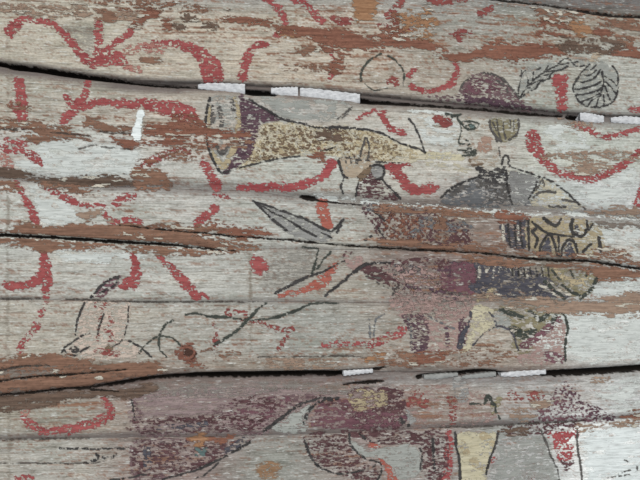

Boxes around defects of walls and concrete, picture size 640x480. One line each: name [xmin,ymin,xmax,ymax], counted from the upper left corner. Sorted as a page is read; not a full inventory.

peeling [0,0,640,75]
crack [0,62,198,89]
crack [245,88,276,96]
crack [360,99,577,121]
peeling [0,205,272,257]
crack [0,224,640,270]
peeling [0,353,167,413]
crack [0,355,386,396]
crack [416,369,502,379]
crack [540,365,640,377]